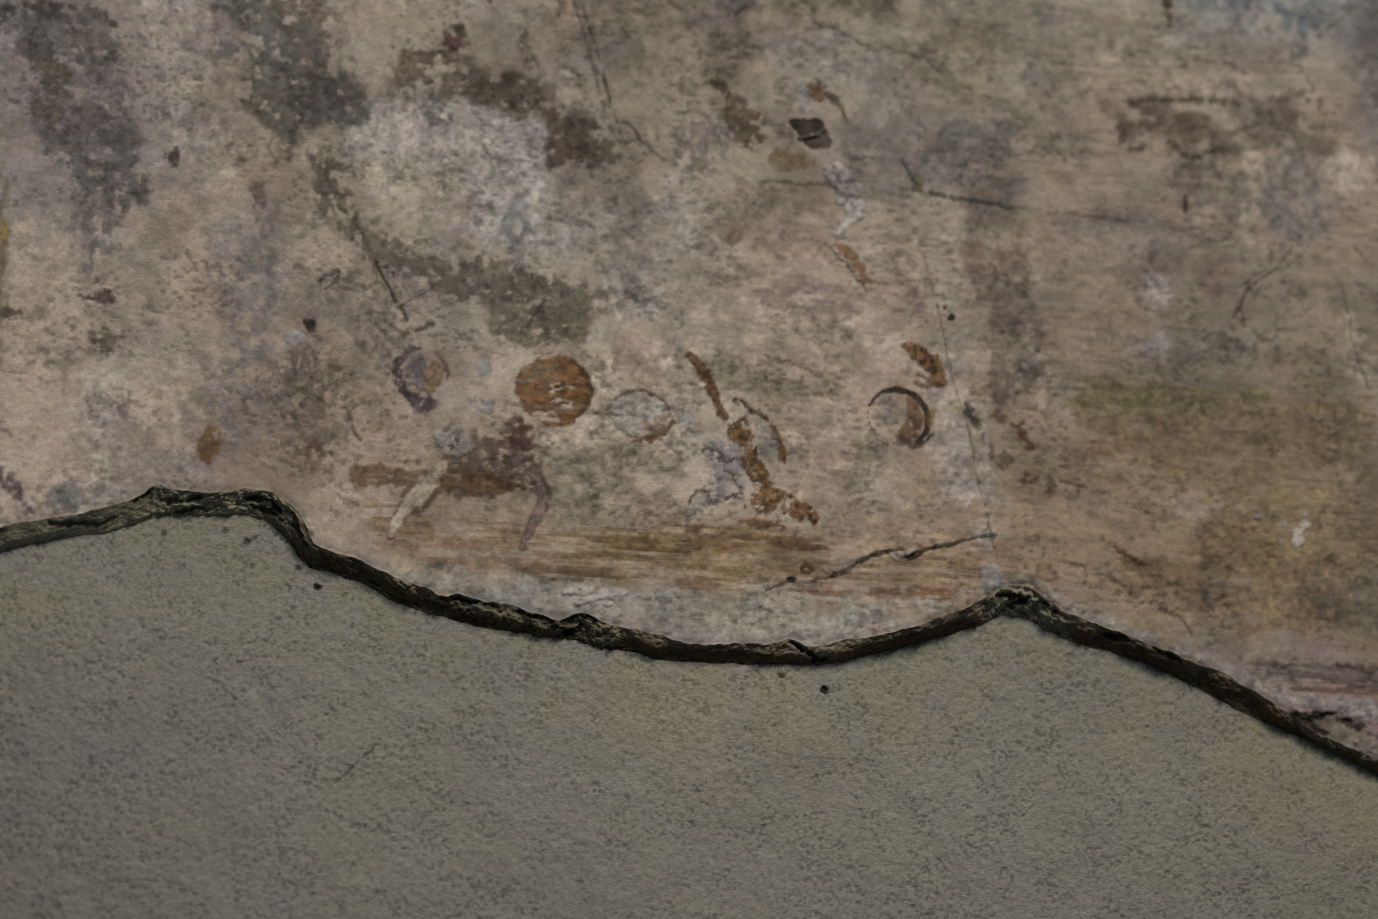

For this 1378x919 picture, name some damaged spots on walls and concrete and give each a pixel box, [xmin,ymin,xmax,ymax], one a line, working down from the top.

spalling [0,484,1378,775]
crack [811,536,995,582]